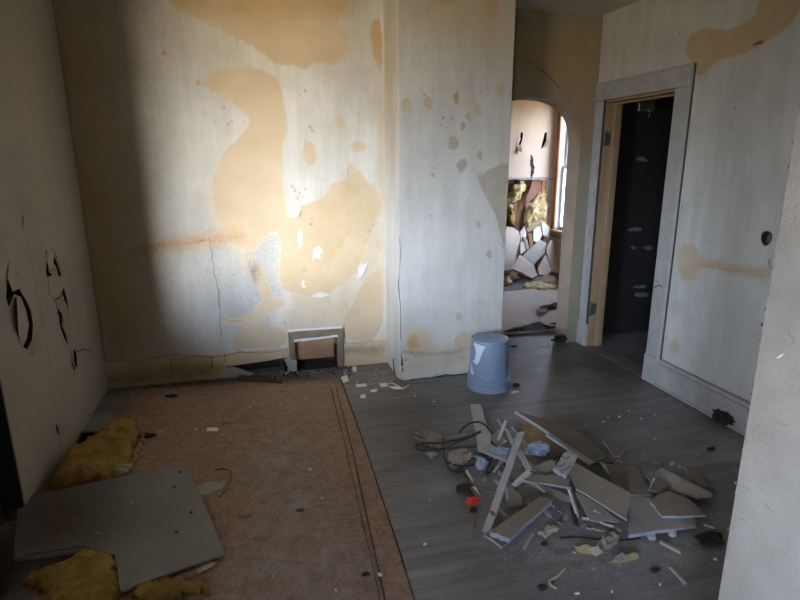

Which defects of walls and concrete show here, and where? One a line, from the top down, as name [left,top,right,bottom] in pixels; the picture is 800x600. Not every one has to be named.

crack [52,0,287,370]
leakage [53,0,603,393]
peeling [477,162,553,248]
spalling [46,248,72,339]
peeling [222,262,284,331]
leakage [676,242,772,284]